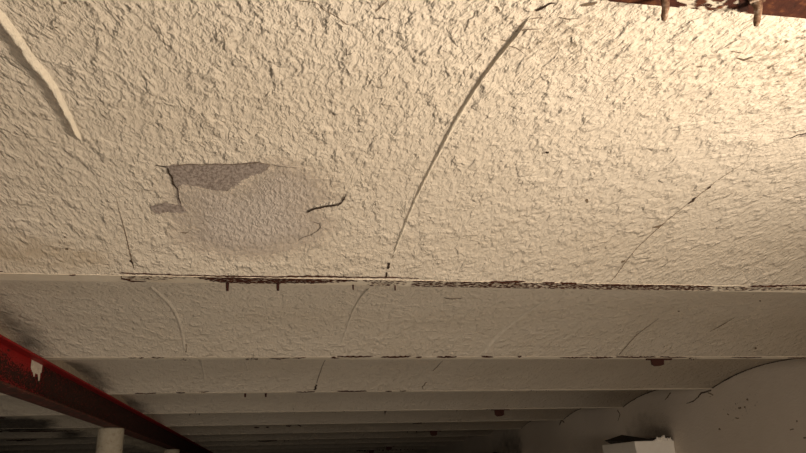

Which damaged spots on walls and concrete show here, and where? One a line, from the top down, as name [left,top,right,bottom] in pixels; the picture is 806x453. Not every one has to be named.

rust [601,0,806,19]
crack [117,202,135,270]
peeling [150,162,291,214]
crack [611,159,750,281]
rust [121,272,806,291]
rust [0,349,209,453]